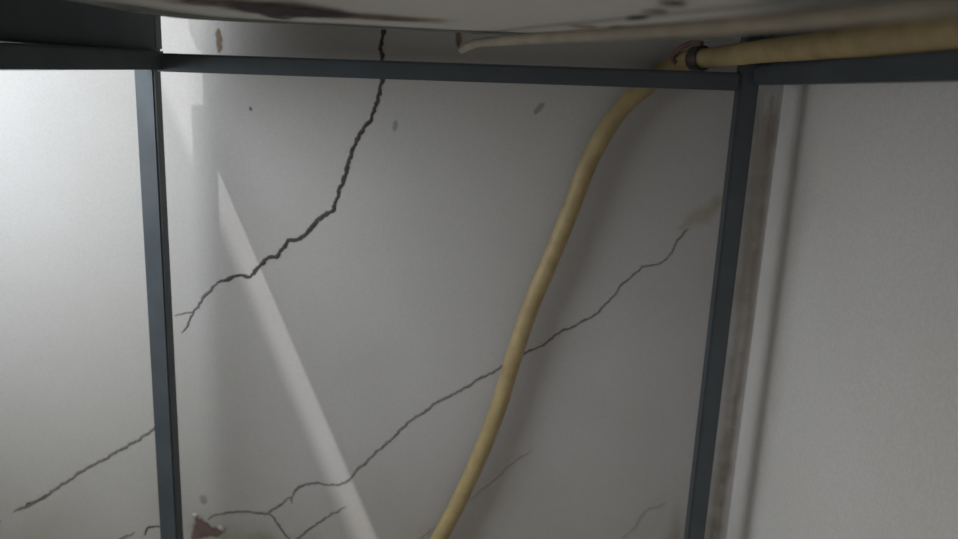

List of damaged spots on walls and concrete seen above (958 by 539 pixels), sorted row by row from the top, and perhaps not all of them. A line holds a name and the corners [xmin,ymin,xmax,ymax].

crack [175,29,386,333]
crack [523,229,687,355]
crack [0,427,155,521]
crack [119,526,160,539]
crack [208,365,502,539]